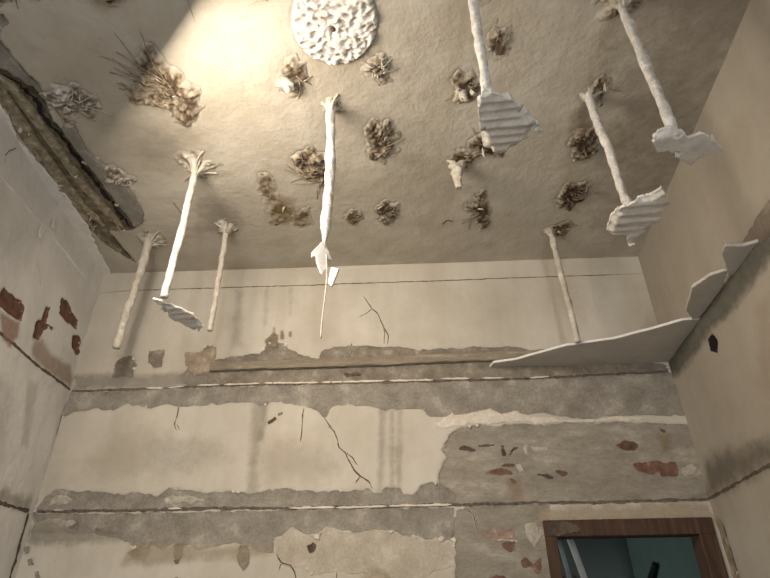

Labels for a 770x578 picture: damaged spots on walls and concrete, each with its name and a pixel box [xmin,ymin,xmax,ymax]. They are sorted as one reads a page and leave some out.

flaking render [0,40,145,263]
peeling [743,200,770,248]
flaking render [0,287,25,321]
flaking render [33,298,81,355]
crack [106,276,558,344]
water stain [668,235,770,374]
crack [0,332,668,436]
peeling [33,342,709,578]
crack [0,418,770,578]